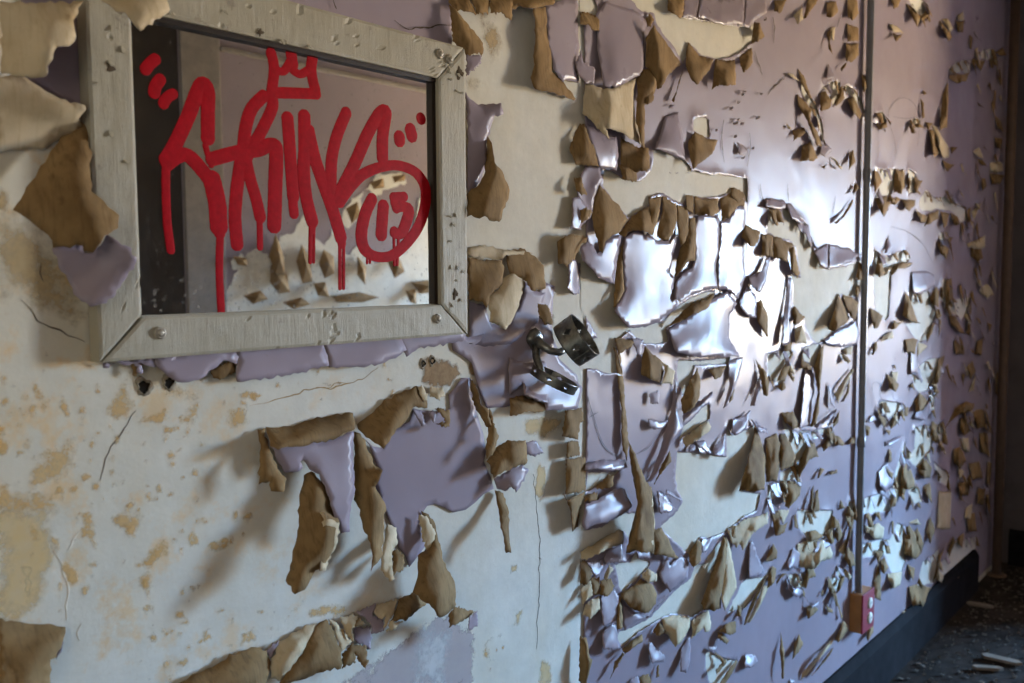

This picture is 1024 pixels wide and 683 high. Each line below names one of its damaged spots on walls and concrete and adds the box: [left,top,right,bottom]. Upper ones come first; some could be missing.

peeling [0,1,137,307]
crack [24,302,83,341]
peeling [448,0,1006,683]
damp [233,392,260,426]
crack [100,414,133,481]
damp [0,449,99,618]
damp [114,503,139,534]
peeling [257,385,450,594]
damp [138,547,165,588]
damp [312,607,345,616]
peeling [180,511,478,683]
peeling [0,618,66,683]